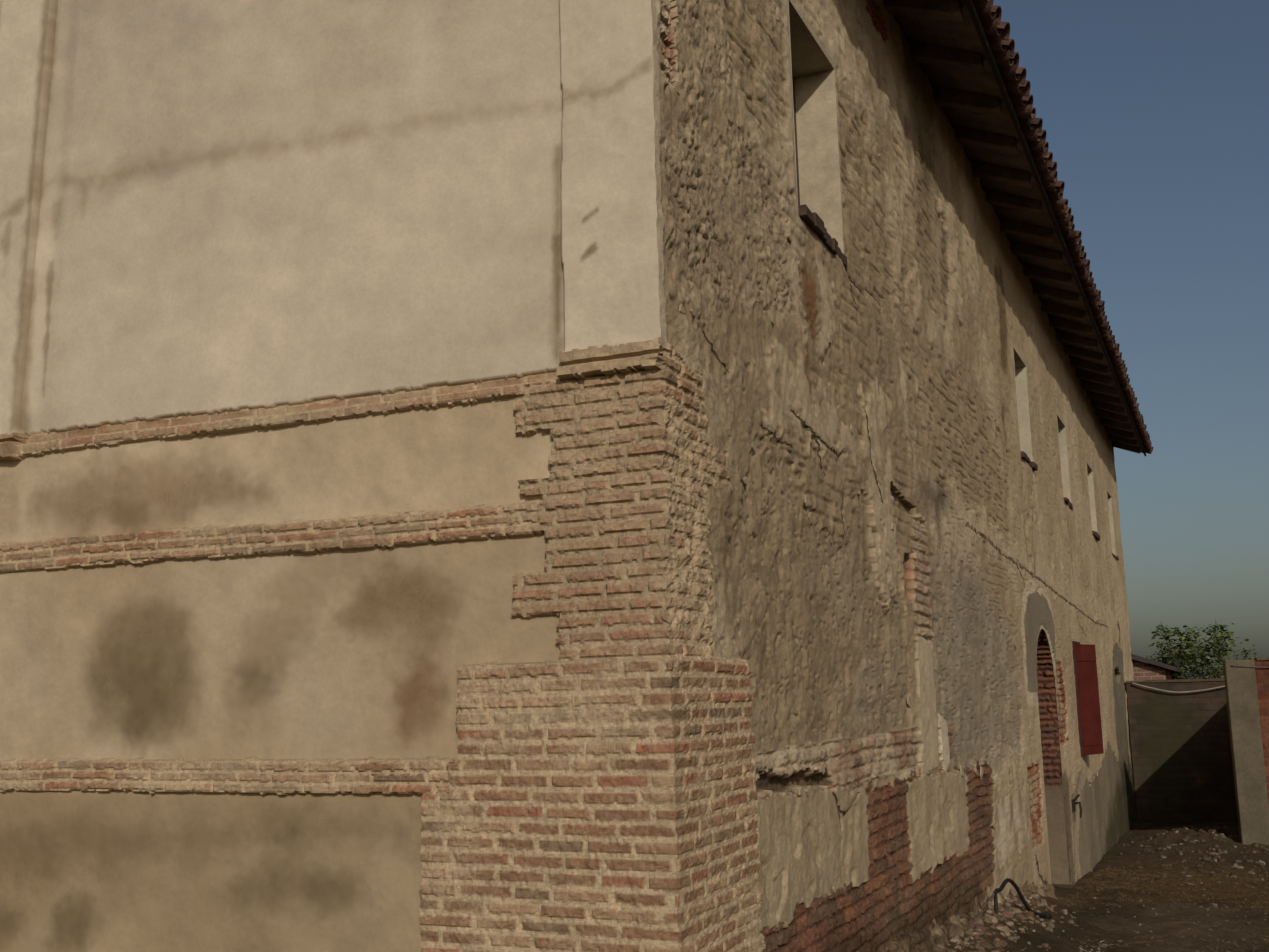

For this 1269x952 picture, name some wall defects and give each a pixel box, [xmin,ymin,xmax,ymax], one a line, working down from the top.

crack [760,409,883,539]